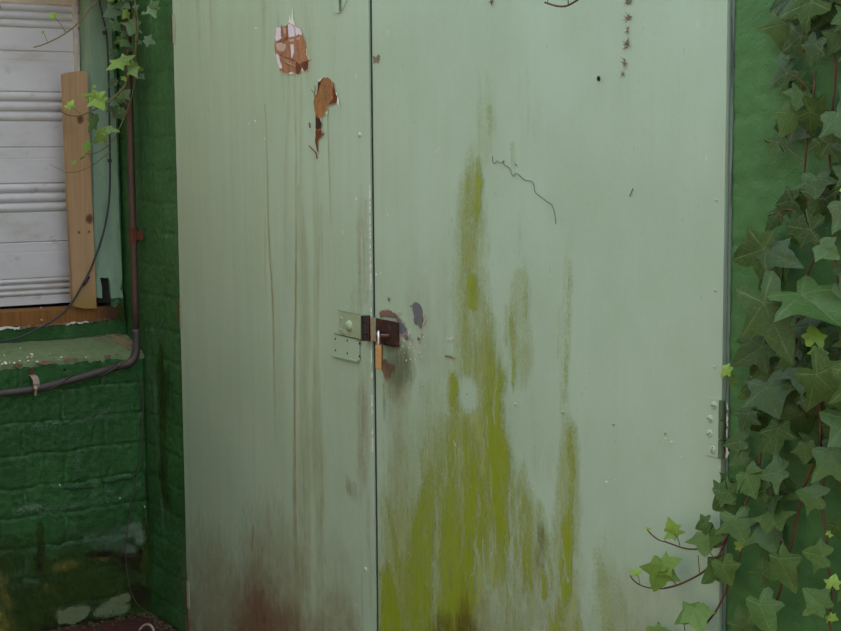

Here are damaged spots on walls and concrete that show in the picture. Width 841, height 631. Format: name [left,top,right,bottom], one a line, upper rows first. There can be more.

peeling [274,8,311,76]
peeling [308,77,340,159]
crack [492,156,556,224]
peeling [369,185,377,290]
peeling [370,297,426,365]